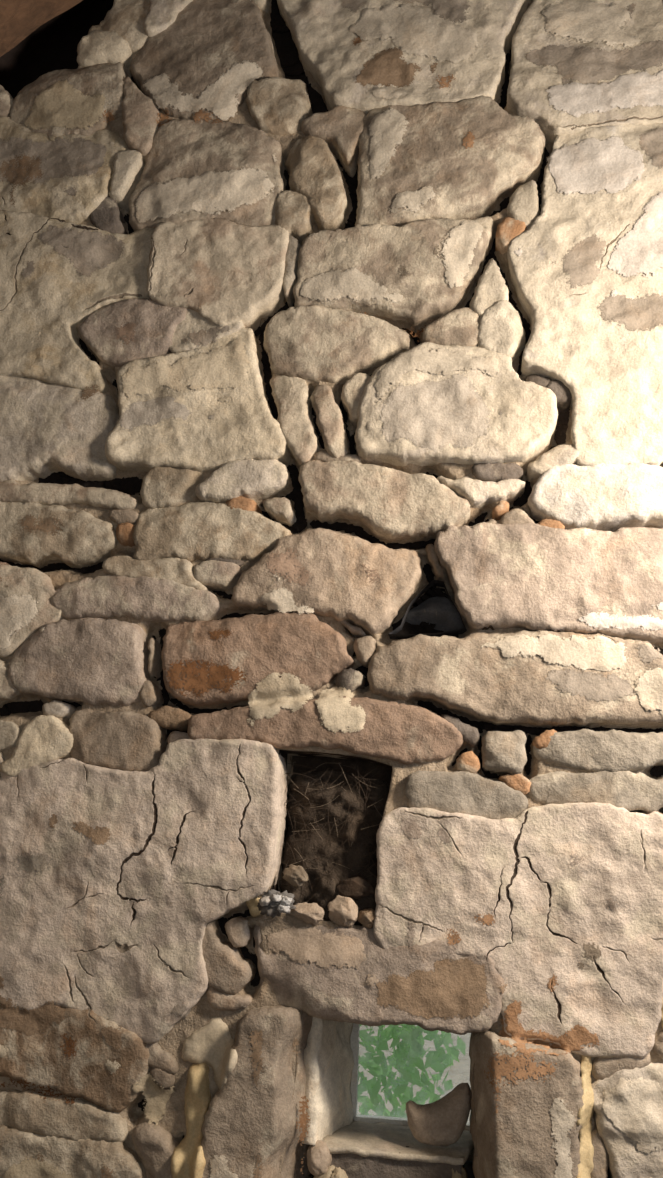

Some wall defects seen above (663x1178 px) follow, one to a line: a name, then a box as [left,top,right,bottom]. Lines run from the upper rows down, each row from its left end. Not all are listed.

crack [405,811,461,854]
crack [64,746,252,1021]
crack [380,905,443,939]
crack [486,808,629,1002]
crack [551,983,562,1024]